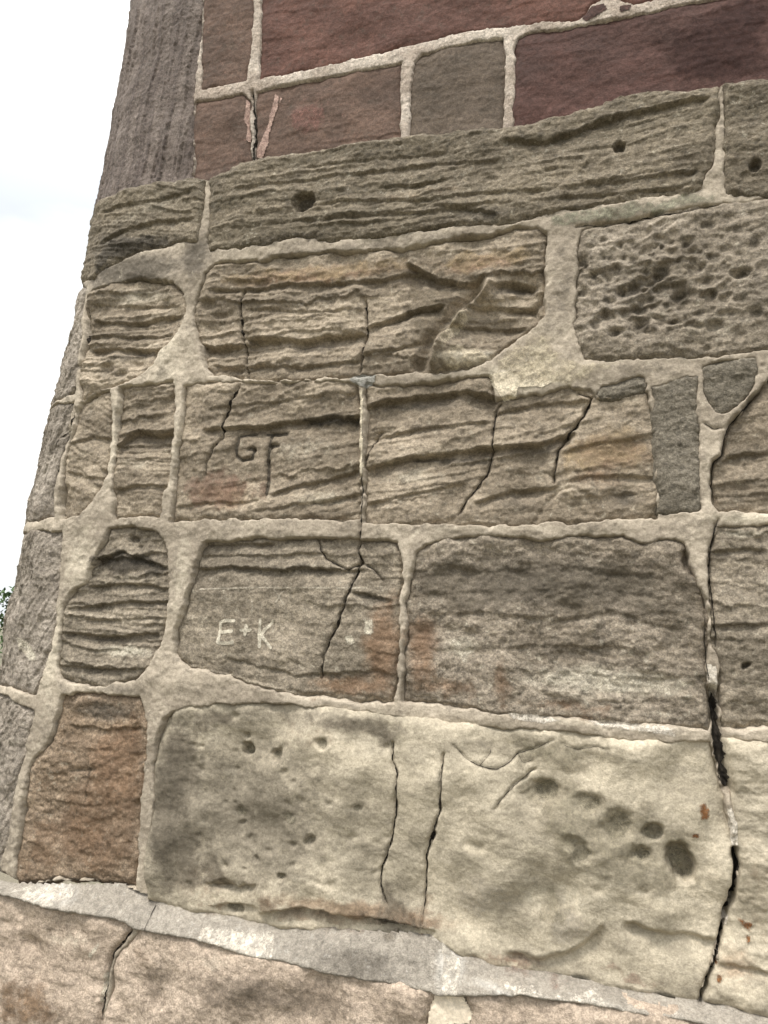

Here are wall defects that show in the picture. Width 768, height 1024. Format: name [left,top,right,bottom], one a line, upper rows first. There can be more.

crack [251,95,259,160]
crack [206,297,248,471]
crack [461,414,497,510]
crack [554,394,592,481]
crack [319,436,381,674]
crack [704,523,729,786]
crack [380,746,398,896]
crack [423,742,606,913]
crack [701,846,739,988]